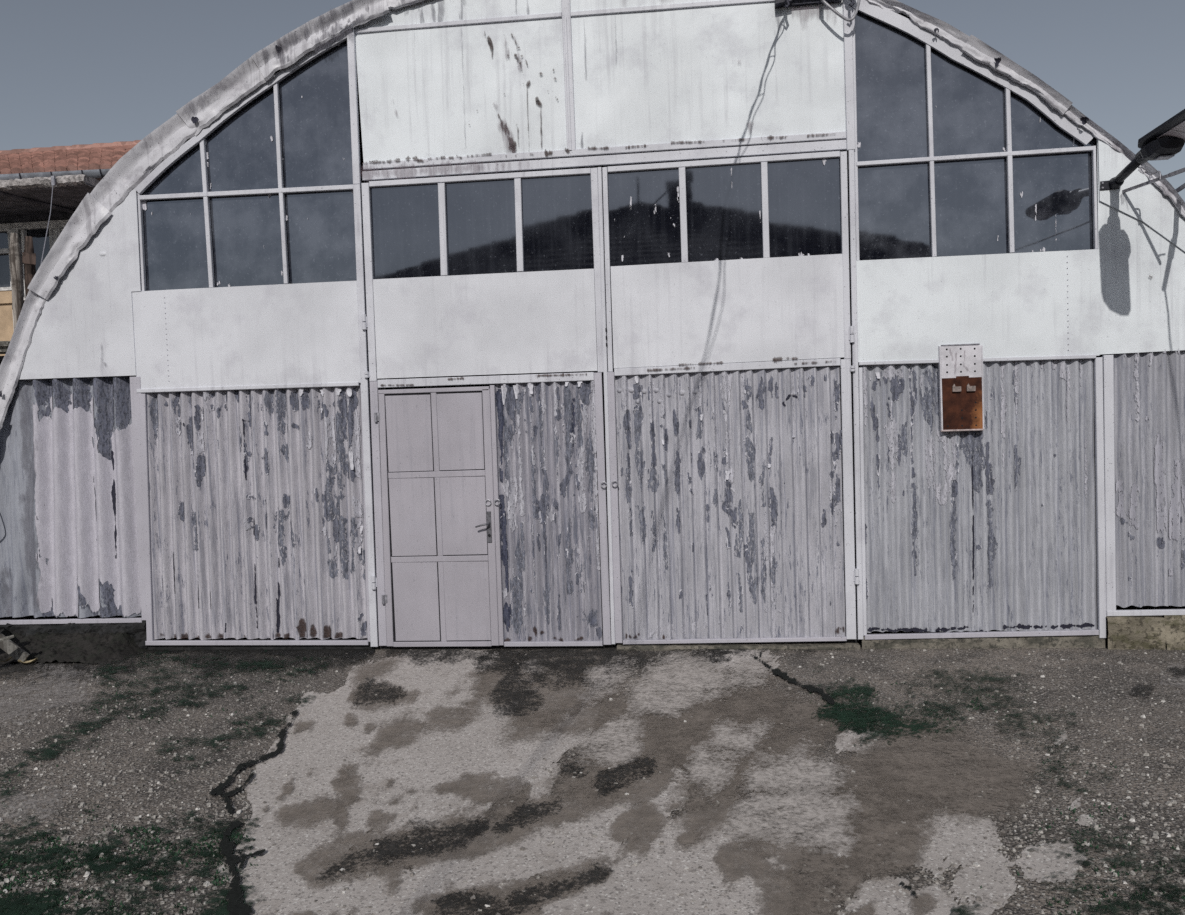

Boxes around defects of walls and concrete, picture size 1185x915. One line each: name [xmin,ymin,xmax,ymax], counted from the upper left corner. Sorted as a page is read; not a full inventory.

rust [366,153,491,163]
rust [498,114,518,156]
rust [526,69,569,156]
peeling [33,376,132,460]
peeling [74,578,123,618]
peeling [149,388,366,580]
peeling [495,381,596,642]
peeling [620,374,842,634]
peeling [869,364,939,576]
rust [942,376,983,430]
peeling [949,393,998,589]
crack [209,710,298,915]